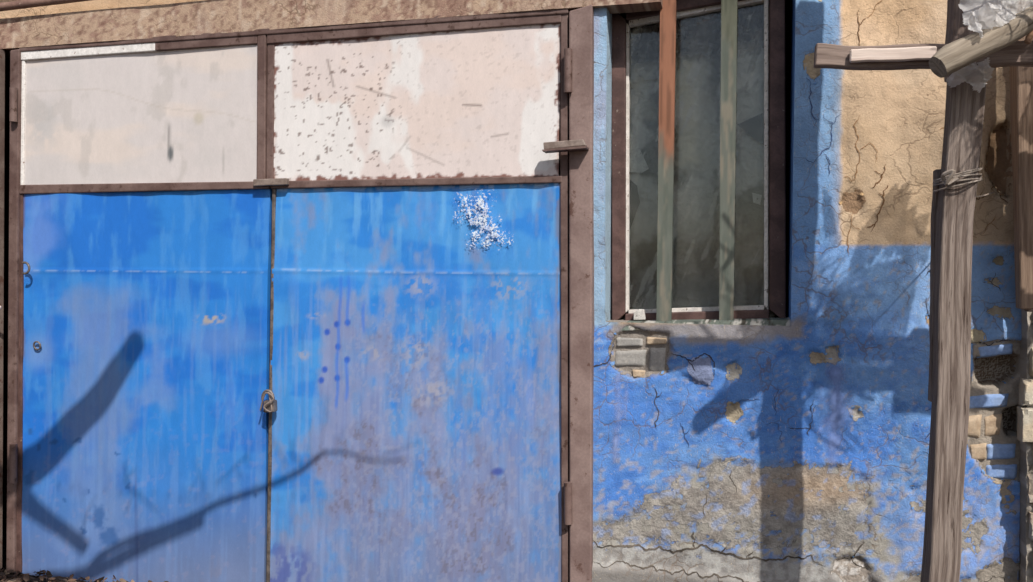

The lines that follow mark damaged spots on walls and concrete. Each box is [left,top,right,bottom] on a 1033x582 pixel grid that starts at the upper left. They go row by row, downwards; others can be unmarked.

peeling [452,189,514,249]
spalling [608,327,670,378]
crack [673,353,715,376]
peeling [687,356,742,385]
peeling [808,345,842,368]
crack [653,387,689,447]
peeling [725,400,743,423]
crack [737,388,818,442]
spalling [967,327,1021,515]
peeling [593,455,876,582]
peeling [961,494,1020,582]